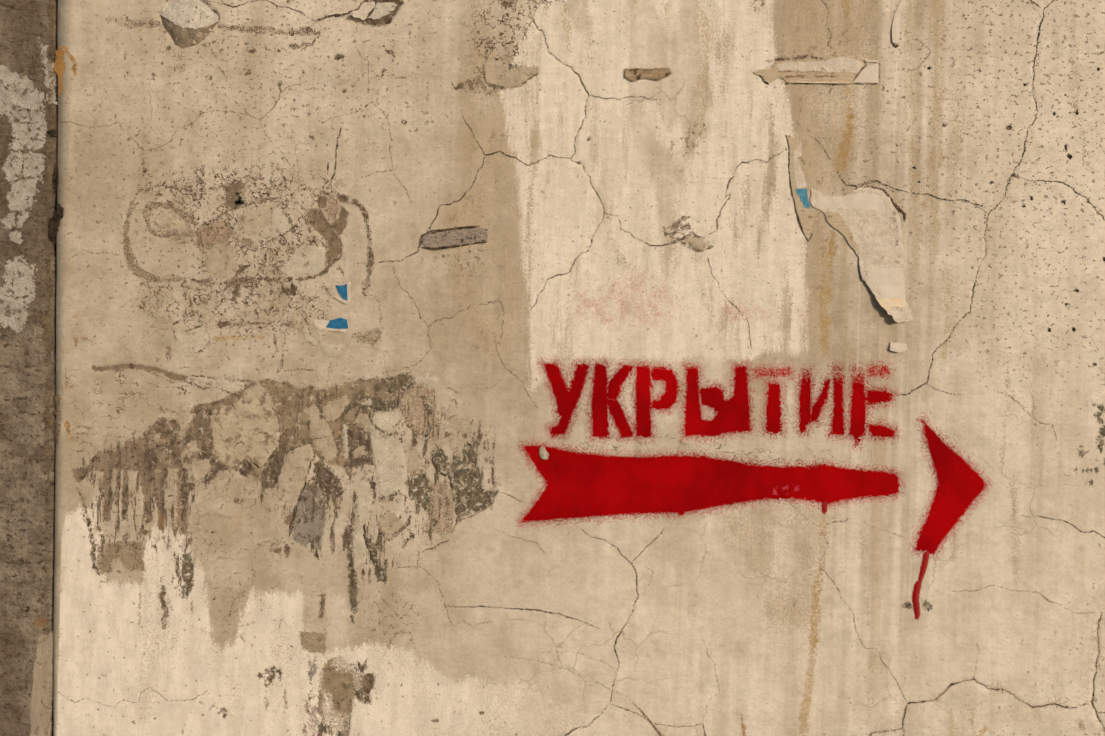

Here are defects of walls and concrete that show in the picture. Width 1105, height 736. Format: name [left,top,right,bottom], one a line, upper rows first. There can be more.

crack [61,84,298,169]
peeling [71,127,503,624]
crack [206,0,412,204]
spalling [317,0,405,27]
damp [564,238,682,330]
spalling [623,67,672,82]
crack [357,0,1104,440]
damp [999,361,1022,583]
spalling [256,666,288,711]
peeling [299,593,379,736]
crack [565,529,720,736]
crack [790,504,1105,736]